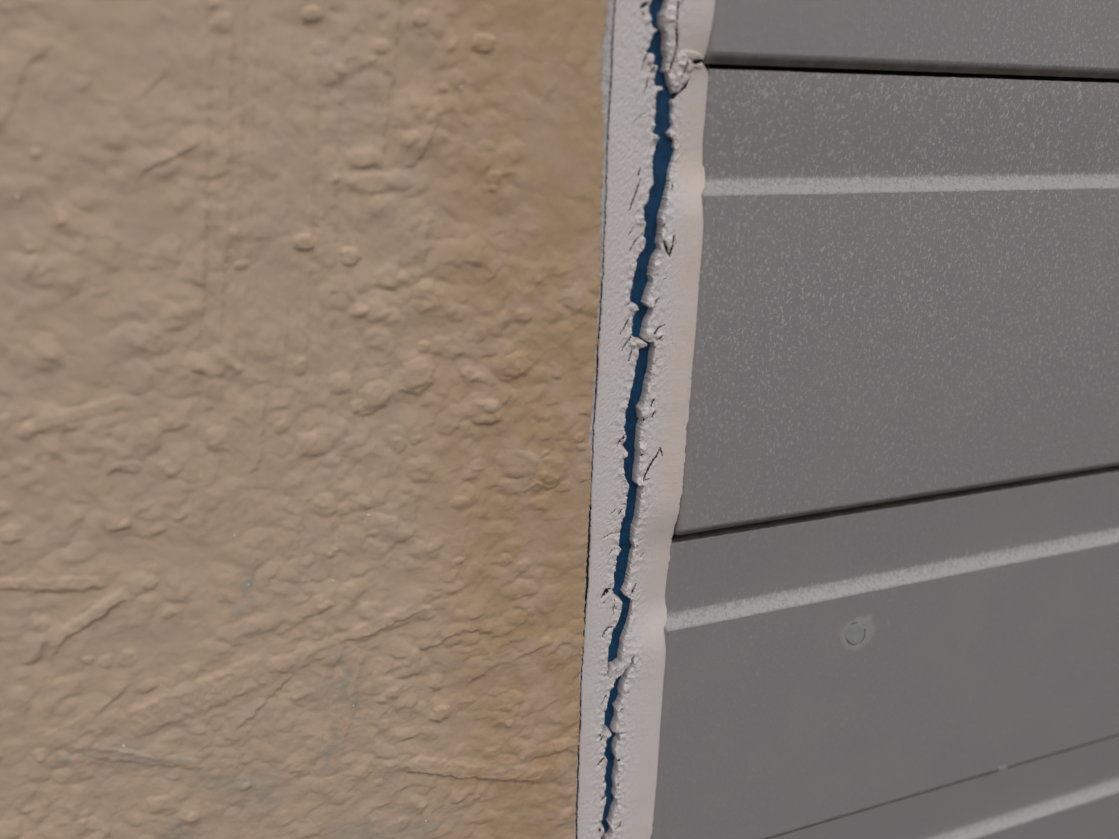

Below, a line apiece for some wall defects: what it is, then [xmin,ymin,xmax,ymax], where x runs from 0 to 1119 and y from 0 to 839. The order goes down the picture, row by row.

crack [575,0,710,839]